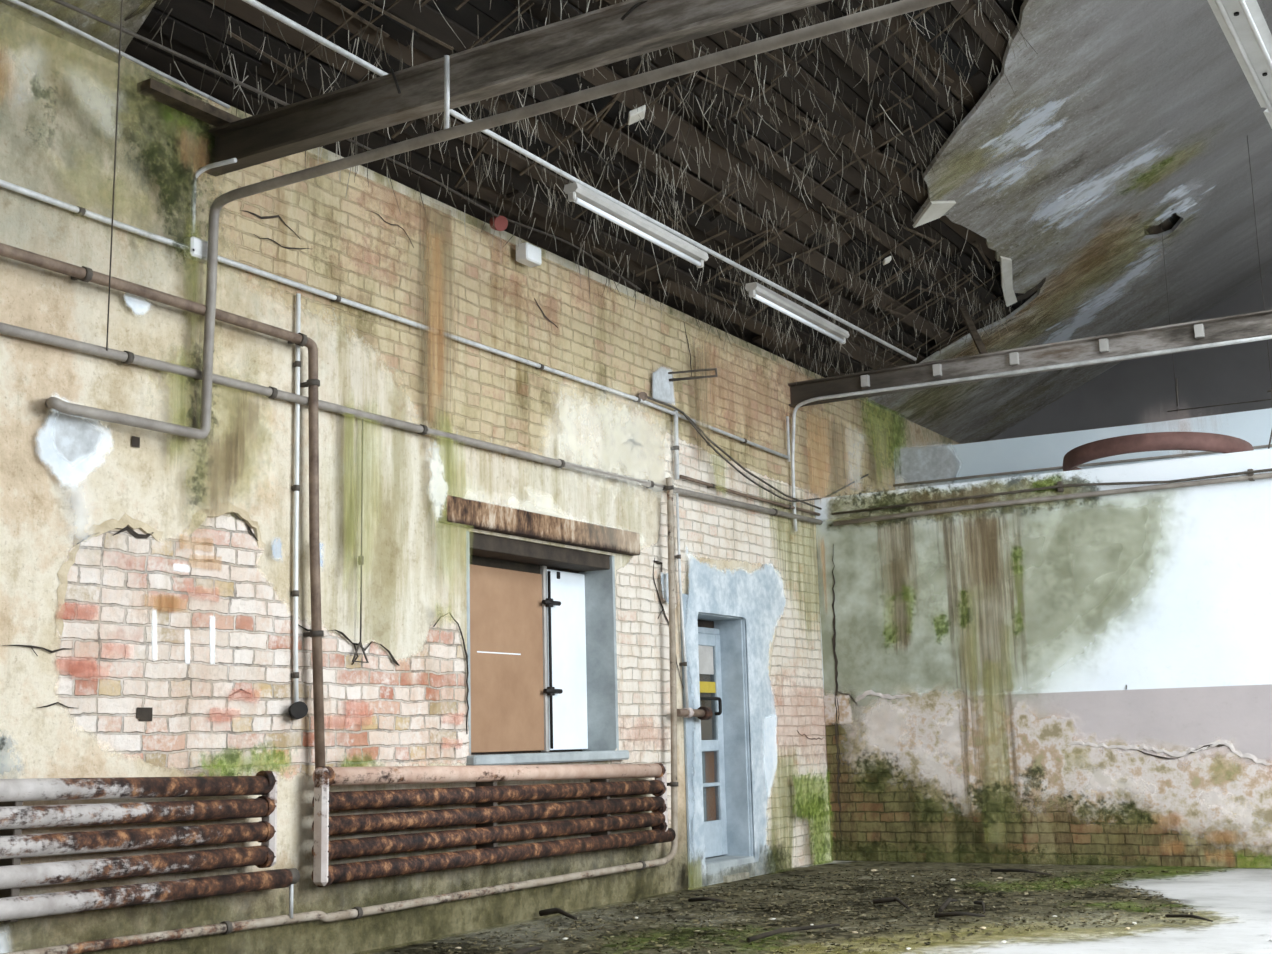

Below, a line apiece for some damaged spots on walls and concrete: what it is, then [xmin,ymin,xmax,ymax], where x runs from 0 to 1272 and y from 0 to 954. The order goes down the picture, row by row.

damp [120,74,219,302]
peeling [980,102,1062,188]
damp [178,336,258,512]
flaking render [211,148,1272,869]
crack [2,645,70,656]
spalling [54,502,470,777]
damp [817,446,1161,840]